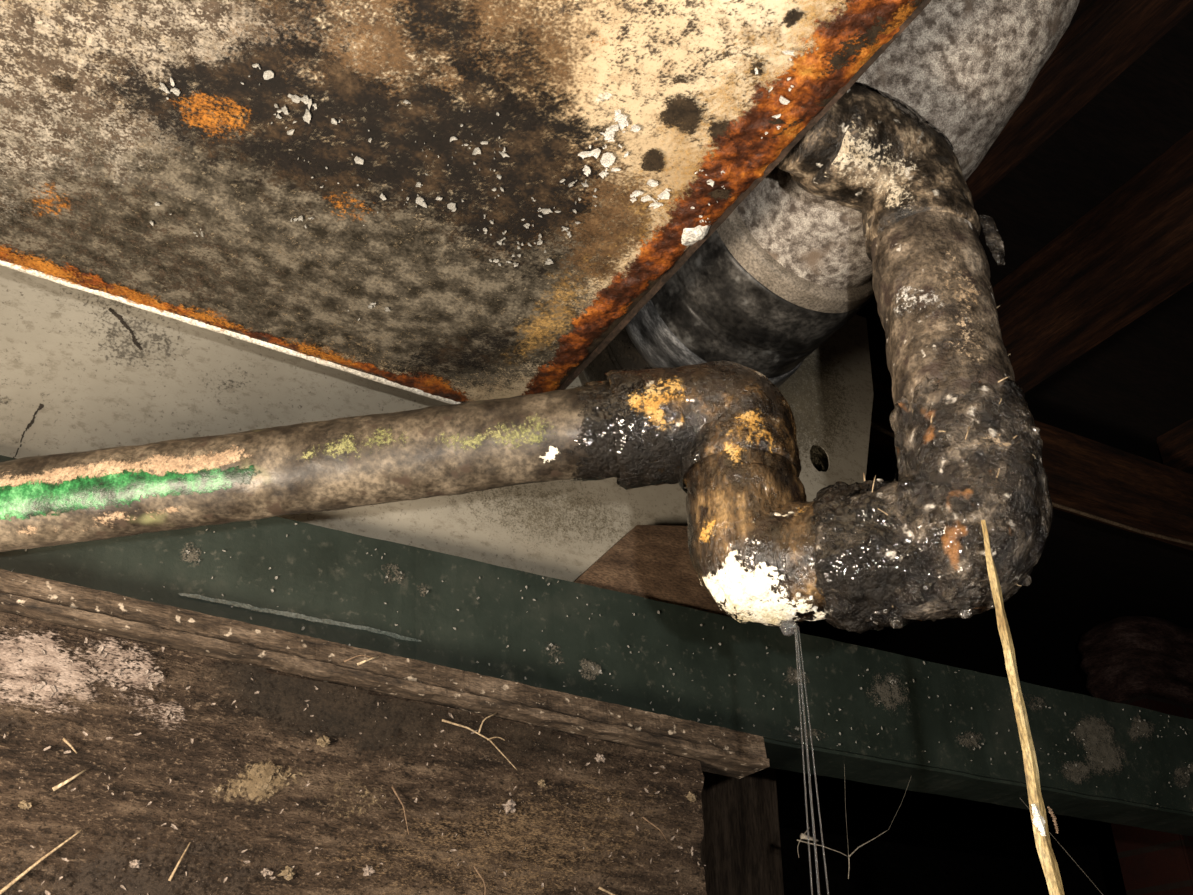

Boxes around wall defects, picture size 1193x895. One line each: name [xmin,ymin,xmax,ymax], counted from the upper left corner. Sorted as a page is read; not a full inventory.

rust [175,93,251,135]
damp [656,75,732,147]
damp [0,0,682,396]
rust [521,0,924,395]
rust [0,245,472,402]
damp [0,812,295,895]